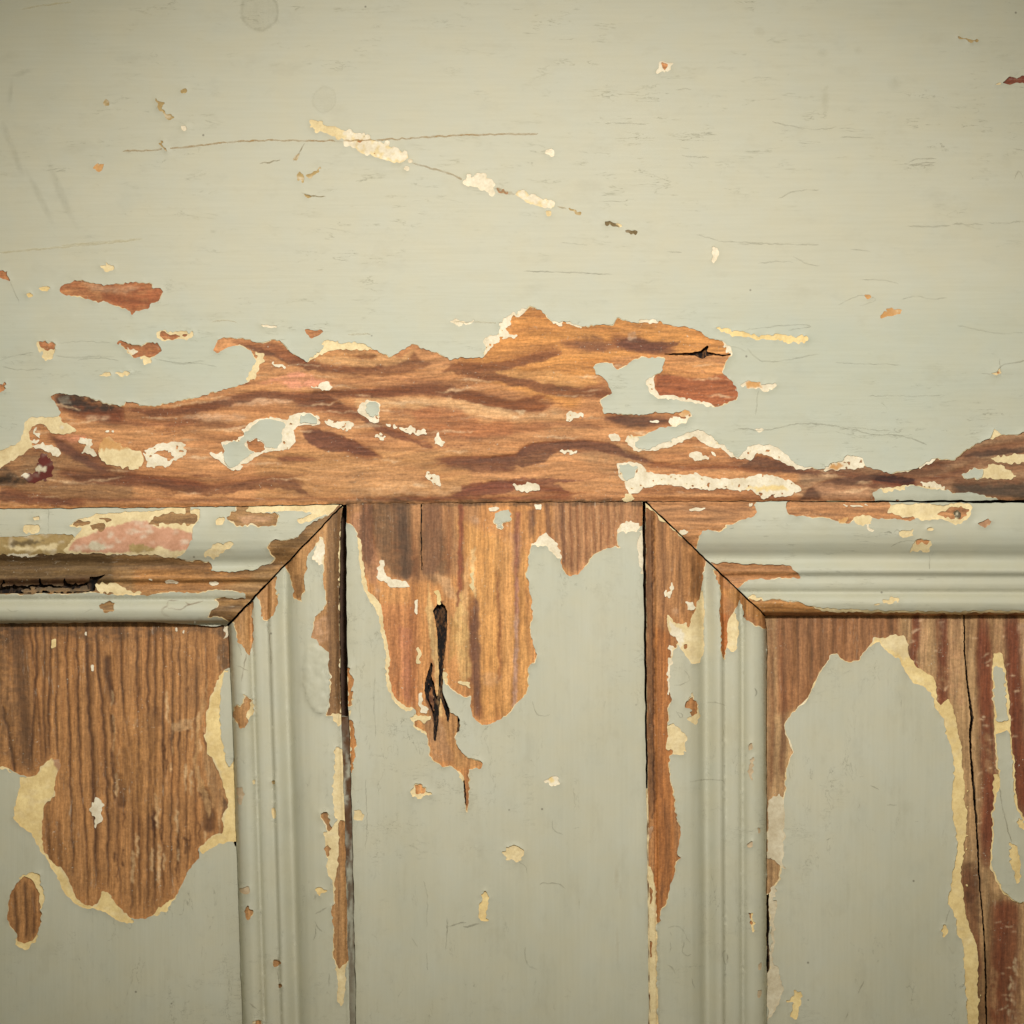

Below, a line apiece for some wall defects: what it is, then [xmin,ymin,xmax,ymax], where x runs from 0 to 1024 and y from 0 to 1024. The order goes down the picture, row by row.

peeling [293,153,321,198]
peeling [27,263,163,315]
peeling [0,306,1024,1024]